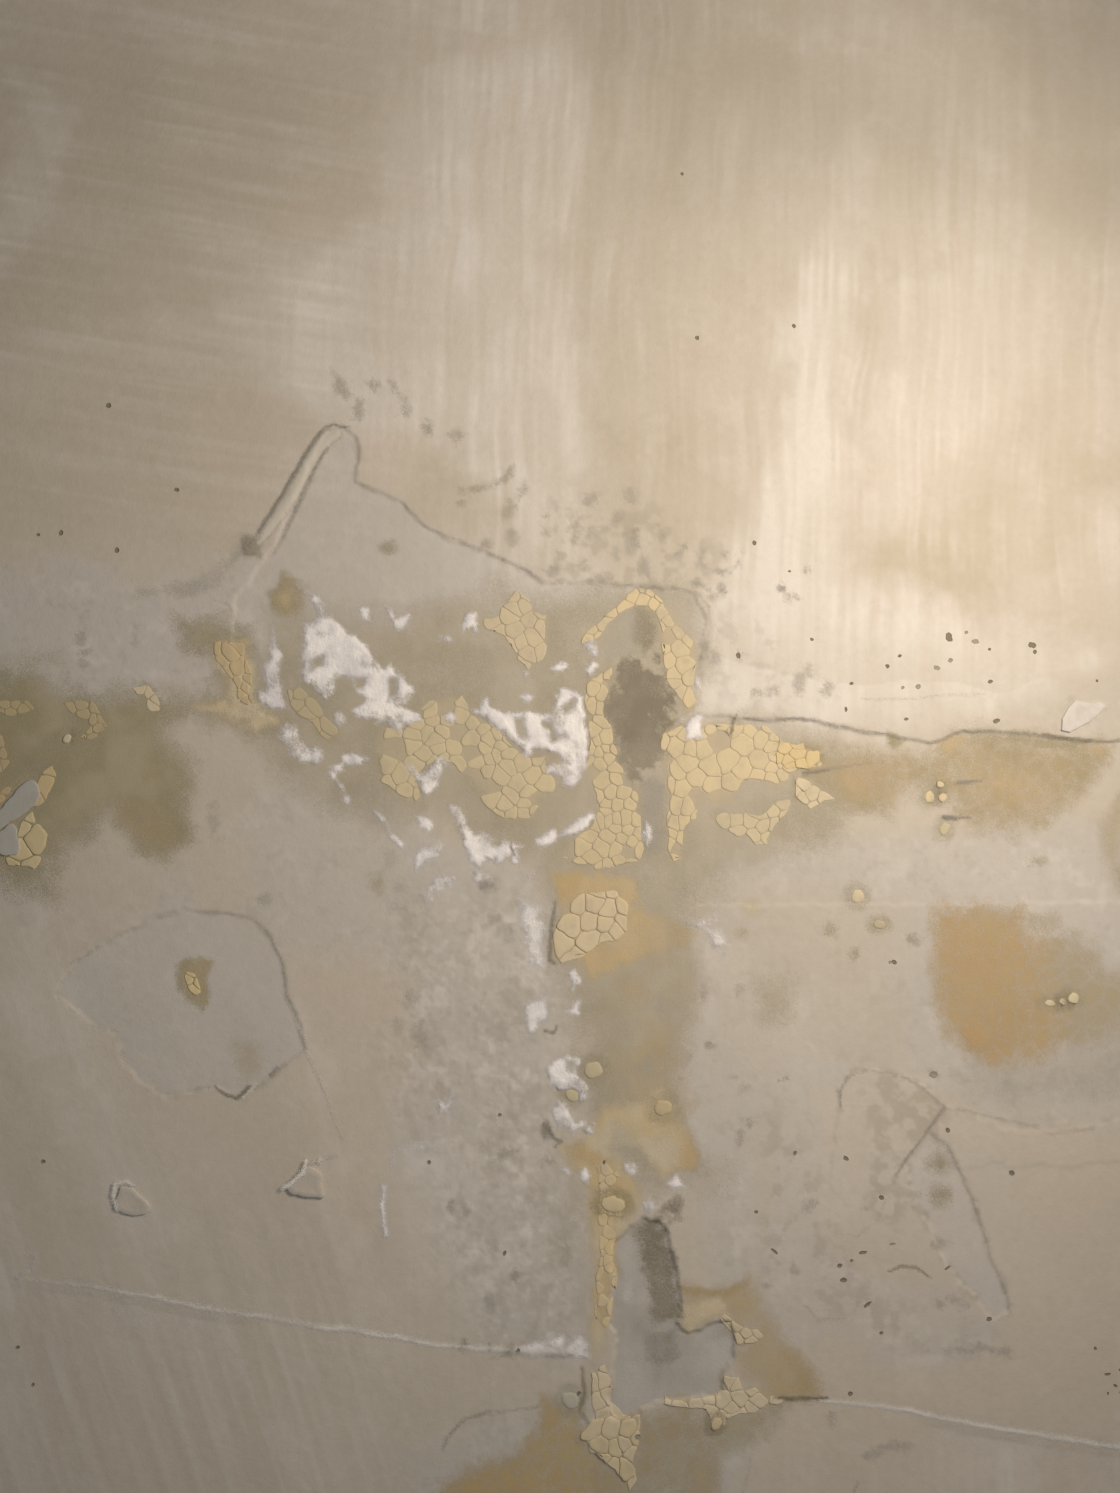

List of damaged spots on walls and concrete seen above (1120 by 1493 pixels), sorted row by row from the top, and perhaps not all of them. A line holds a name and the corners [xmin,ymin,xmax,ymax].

peeling [478,587,553,673]
peeling [0,695,56,869]
peeling [370,694,558,822]
peeling [547,662,645,967]
peeling [576,587,841,870]
crack [722,692,1120,775]
damp [0,489,875,1363]
crack [9,1251,590,1423]
peeling [576,1362,643,1490]
peeling [661,1371,788,1432]
crack [773,1395,1120,1484]